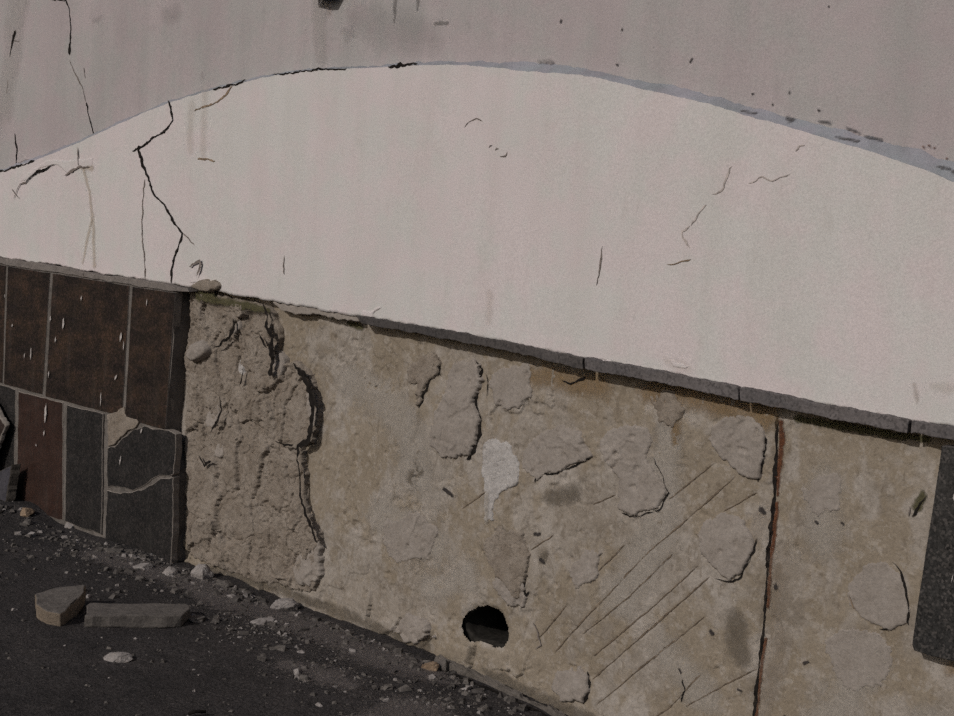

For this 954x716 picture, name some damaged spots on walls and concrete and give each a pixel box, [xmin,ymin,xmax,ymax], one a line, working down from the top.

crack [10,30,19,54]
crack [54,0,94,134]
crack [0,133,34,172]
spalling [184,259,324,592]
crack [534,457,591,482]
crack [622,458,669,517]
rust [767,420,785,608]
crack [715,415,778,716]
spalling [461,605,509,648]
crack [520,579,541,648]
crack [438,669,547,716]
rust [755,638,767,716]